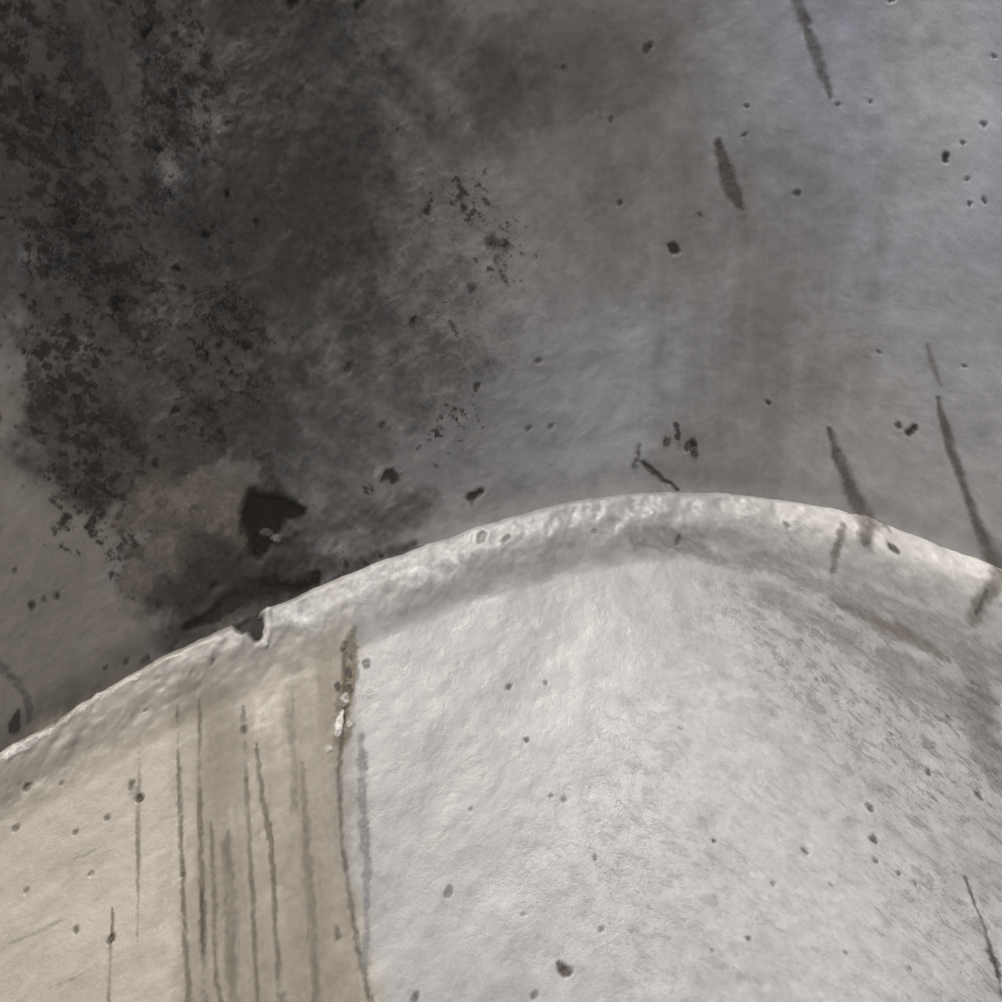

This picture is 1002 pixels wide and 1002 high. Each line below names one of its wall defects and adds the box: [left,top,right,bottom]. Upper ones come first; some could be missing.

leakage [0,0,385,634]
leakage [448,168,537,285]
leakage [716,141,743,211]
spalling [241,487,305,567]
leakage [337,549,470,600]
leakage [937,399,1002,622]
leakage [0,732,49,760]
leakage [177,758,191,1002]
leakage [197,700,259,1002]
leakage [245,743,280,979]
leakage [319,677,352,734]
crack [335,719,371,995]